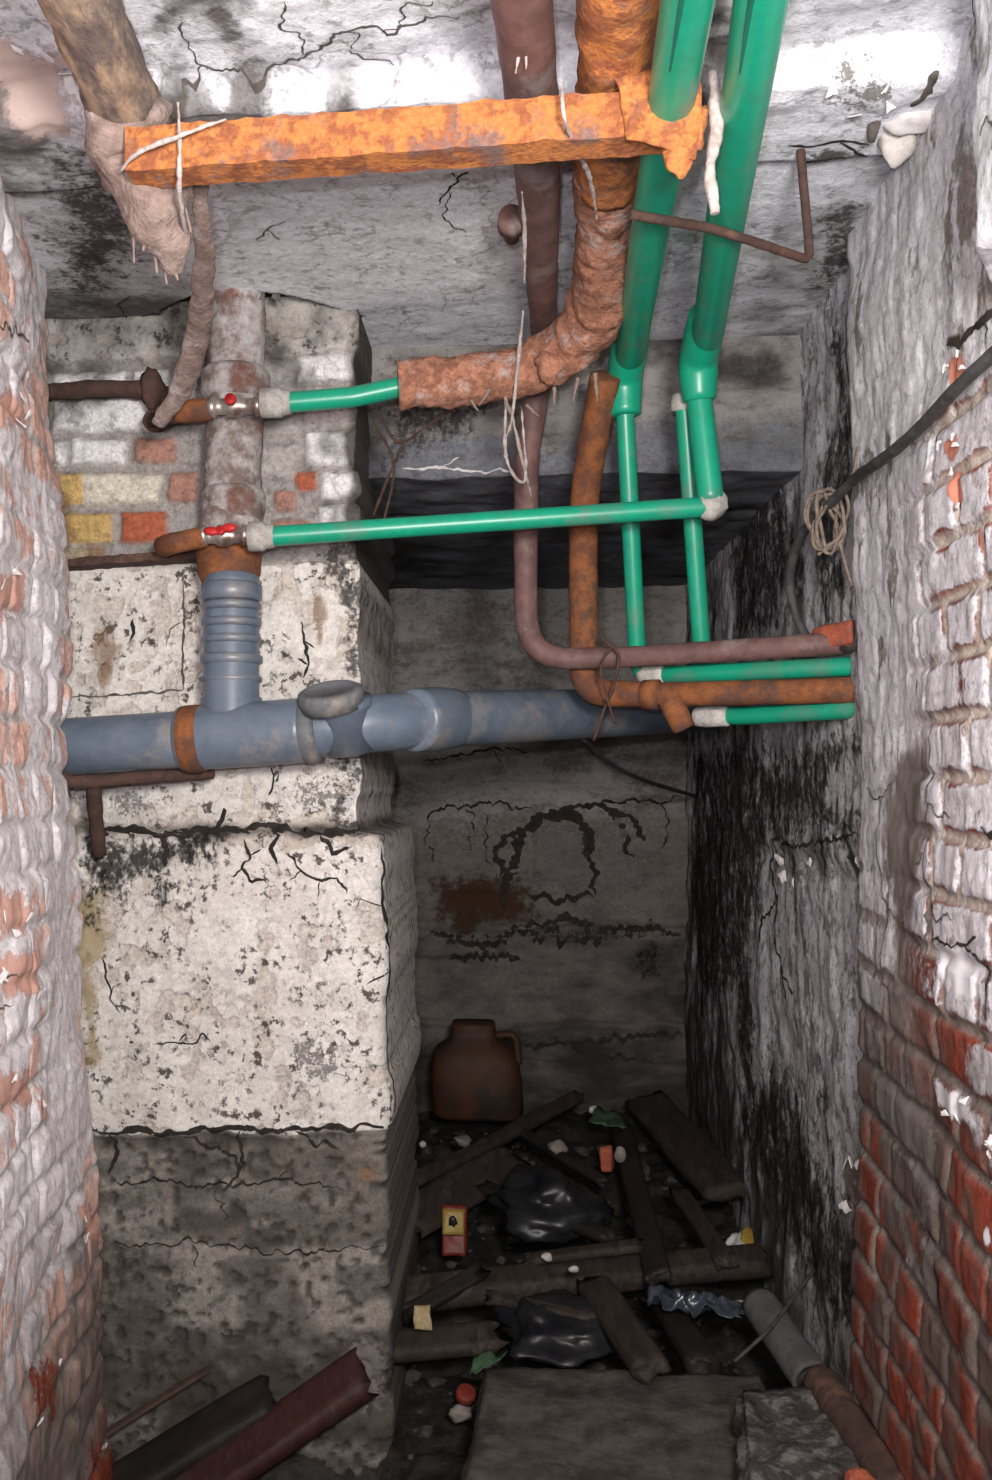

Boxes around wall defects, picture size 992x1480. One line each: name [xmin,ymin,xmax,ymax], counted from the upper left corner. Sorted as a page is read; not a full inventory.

flaking render [0,35,85,142]
crack [171,1,459,115]
crack [424,746,527,763]
crack [423,795,681,964]
crack [85,766,396,1267]
crack [521,1029,683,1062]
damp [691,708,861,1350]
peeling [934,1079,992,1159]